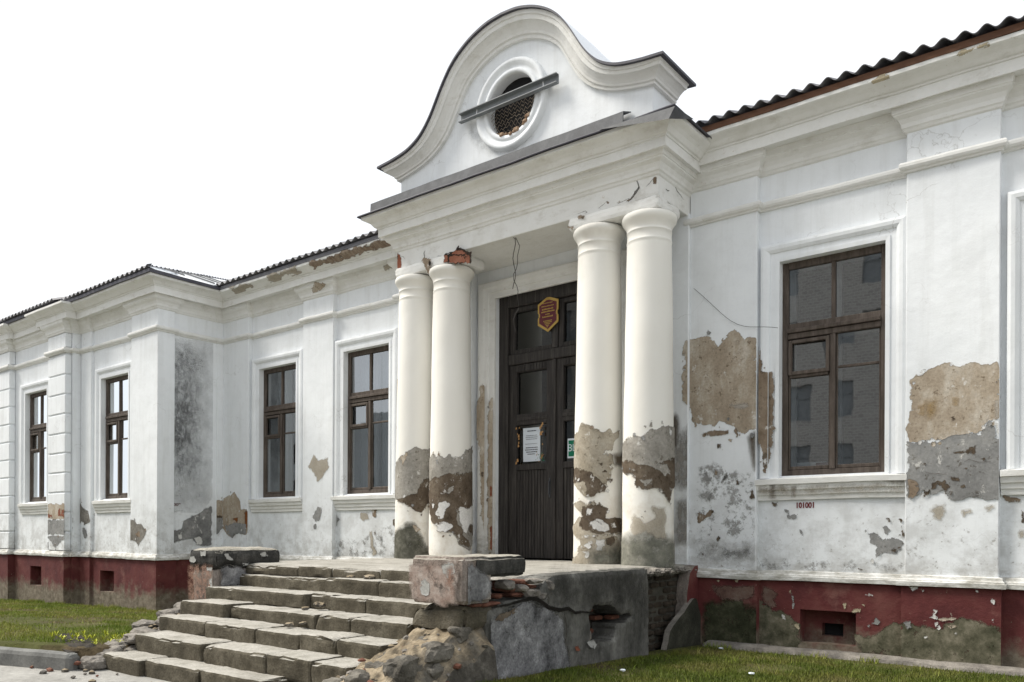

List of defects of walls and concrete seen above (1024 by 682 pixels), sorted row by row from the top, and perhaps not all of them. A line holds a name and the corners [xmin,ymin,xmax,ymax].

flaking render [267,239,401,293]
flaking render [422,246,472,274]
water stain [174,354,196,473]
flaking render [681,329,775,473]
flaking render [130,519,146,545]
flaking render [216,491,248,538]
flaking render [309,455,329,481]
flaking render [395,385,493,554]
flaking render [572,421,675,564]
flaking render [906,362,1024,537]
crack [491,594,594,653]
peeling [854,609,1001,666]